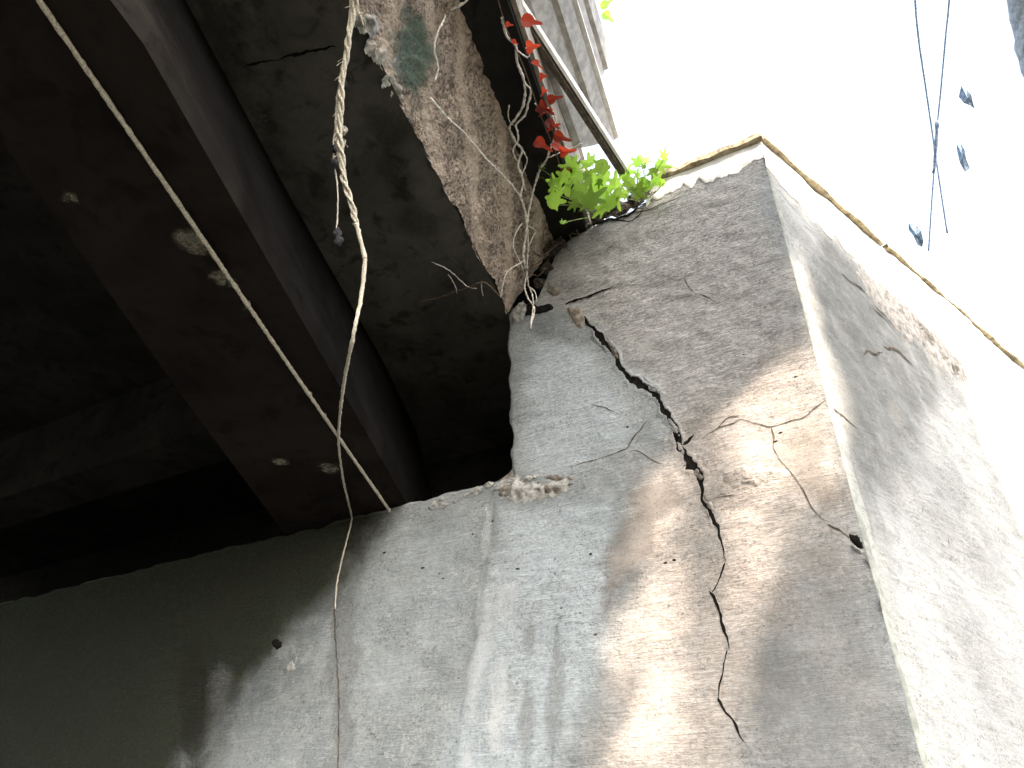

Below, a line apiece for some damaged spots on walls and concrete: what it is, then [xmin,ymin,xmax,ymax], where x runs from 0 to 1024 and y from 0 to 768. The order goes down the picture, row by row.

crack [246,45,336,66]
damp [175,231,208,254]
spalling [428,474,574,510]
crack [570,311,855,741]